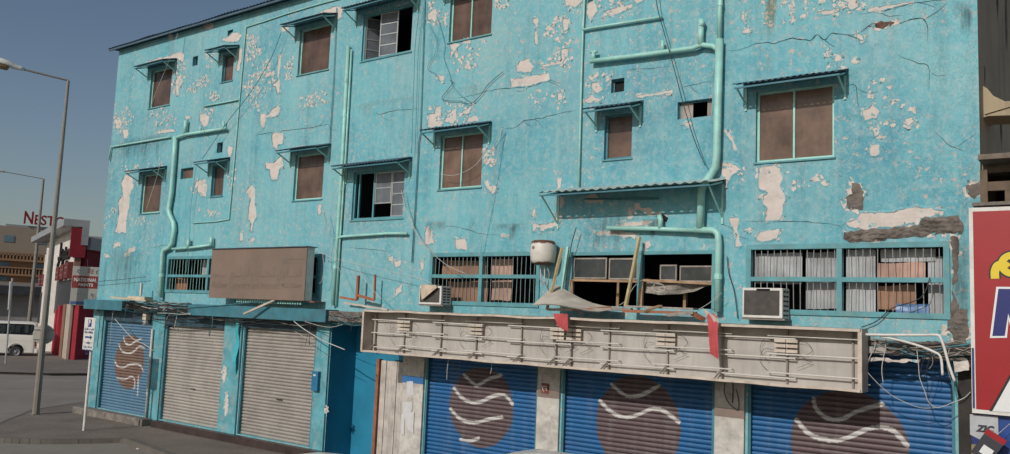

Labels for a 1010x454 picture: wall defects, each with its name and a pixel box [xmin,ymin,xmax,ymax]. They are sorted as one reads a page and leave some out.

peeling [448,37,486,72]
peeling [510,0,645,110]
peeling [740,0,915,45]
crack [723,0,944,76]
peeling [113,103,134,140]
peeling [221,31,294,182]
peeling [426,102,479,128]
peeling [859,78,919,158]
peeling [104,158,163,259]
peeling [239,183,258,245]
peeling [720,128,832,248]
spalling [840,177,971,372]